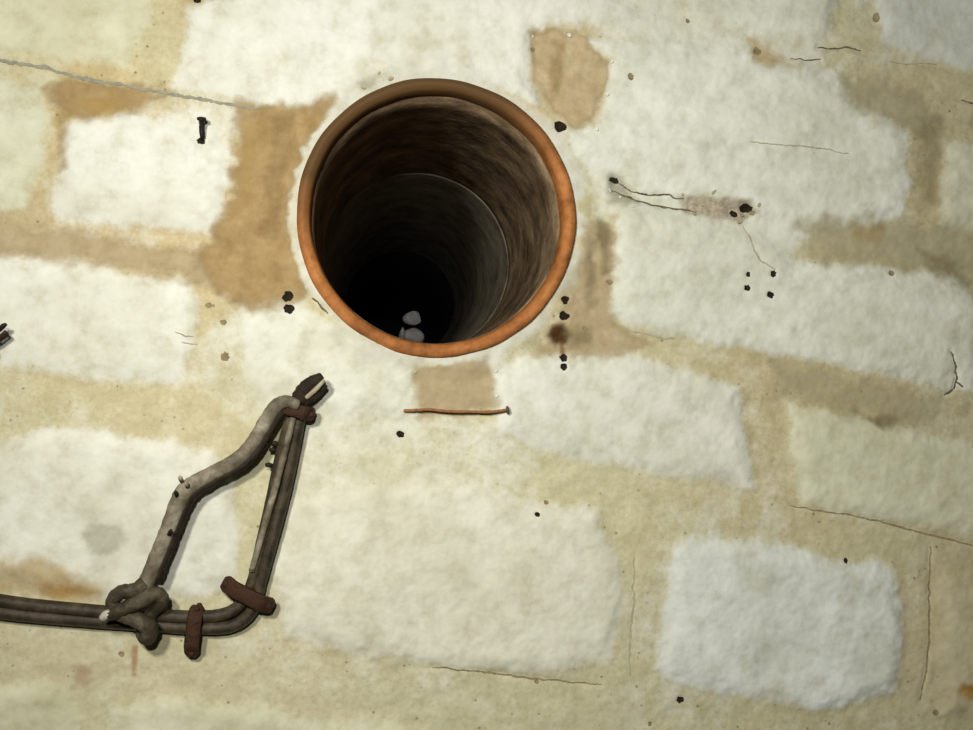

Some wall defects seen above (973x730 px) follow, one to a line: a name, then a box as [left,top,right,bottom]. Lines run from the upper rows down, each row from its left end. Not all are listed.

crack [612,183,696,213]
crack [742,225,775,269]
crack [790,505,973,701]